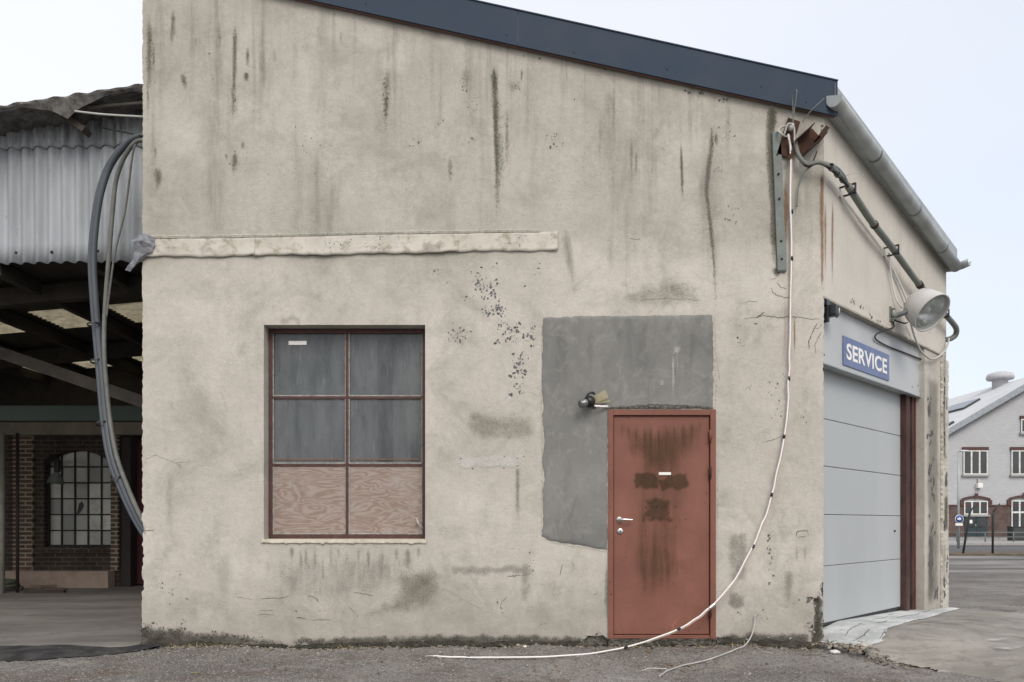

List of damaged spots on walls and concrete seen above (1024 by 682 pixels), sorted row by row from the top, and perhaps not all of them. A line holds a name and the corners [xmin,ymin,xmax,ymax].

leakage [491,72,508,202]
leakage [705,130,718,276]
rust [821,178,833,279]
crack [745,278,822,352]
flaking render [464,262,626,561]
rust [635,473,688,521]
peeling [929,514,948,599]
flaking render [716,582,824,648]